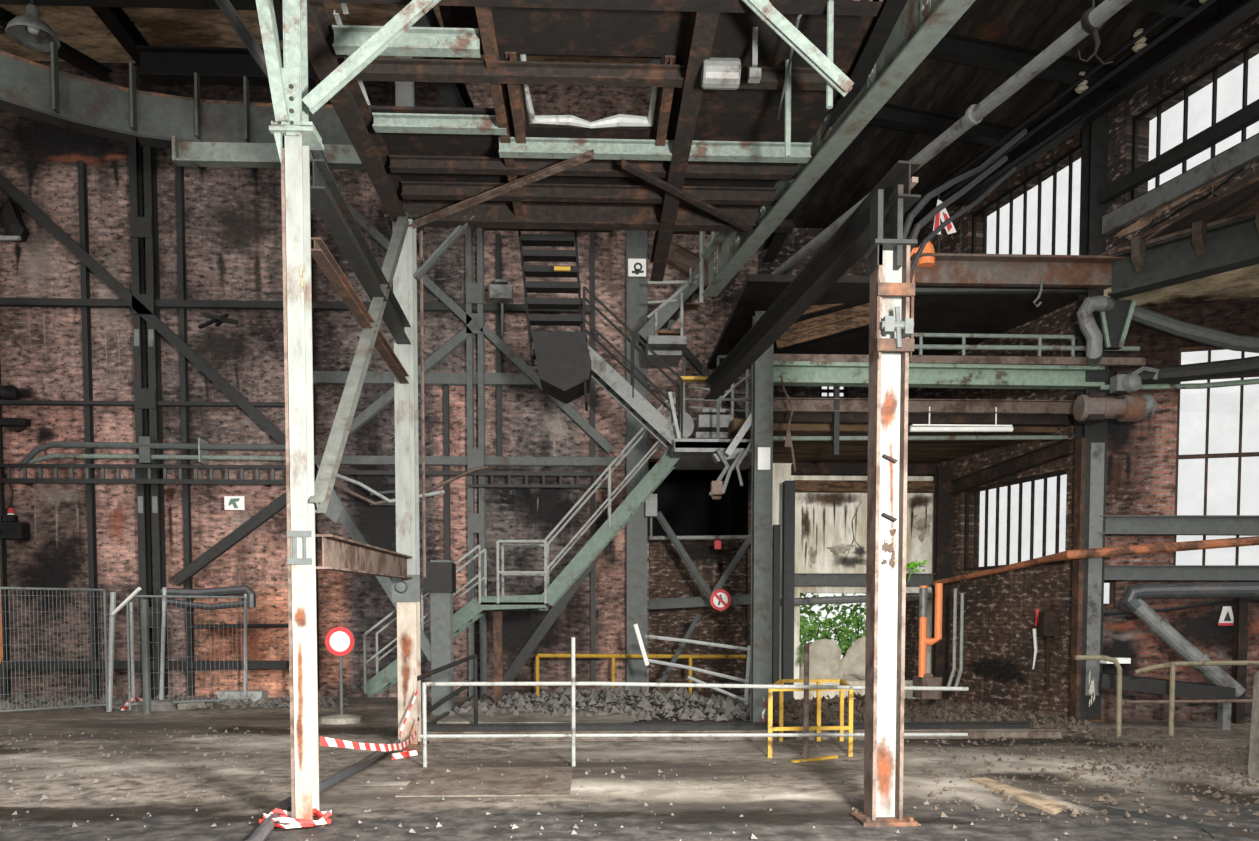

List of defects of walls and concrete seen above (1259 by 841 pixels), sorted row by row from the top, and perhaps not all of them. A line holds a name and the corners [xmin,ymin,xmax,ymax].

corrosion [881,392,897,426]
water stain [802,492,857,561]
water stain [910,496,931,535]
corrosion [295,609,306,627]
corrosion [876,744,893,797]